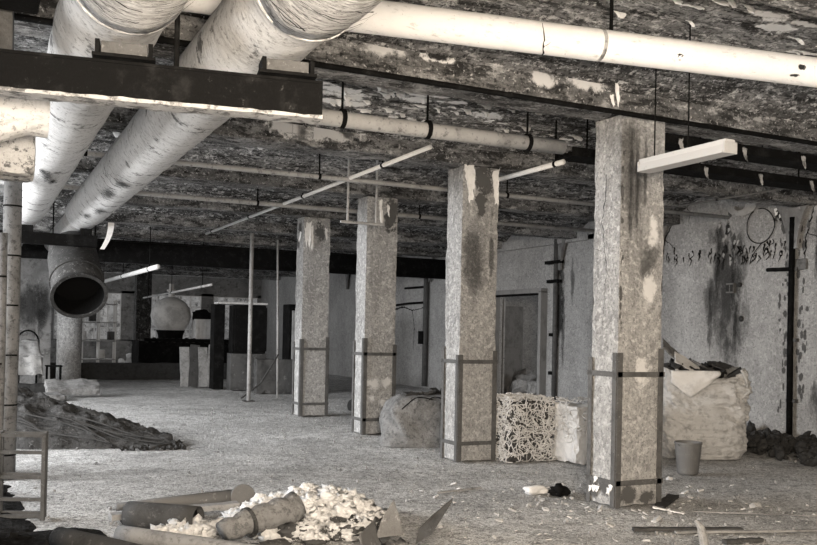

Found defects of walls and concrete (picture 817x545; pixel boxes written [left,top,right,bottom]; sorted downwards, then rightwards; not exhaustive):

peeling [712,0,817,77]
peeling [323,82,531,133]
peeling [610,83,620,107]
damp [648,216,658,247]
damp [643,274,657,302]
flaking render [666,208,809,413]
damp [635,357,652,391]